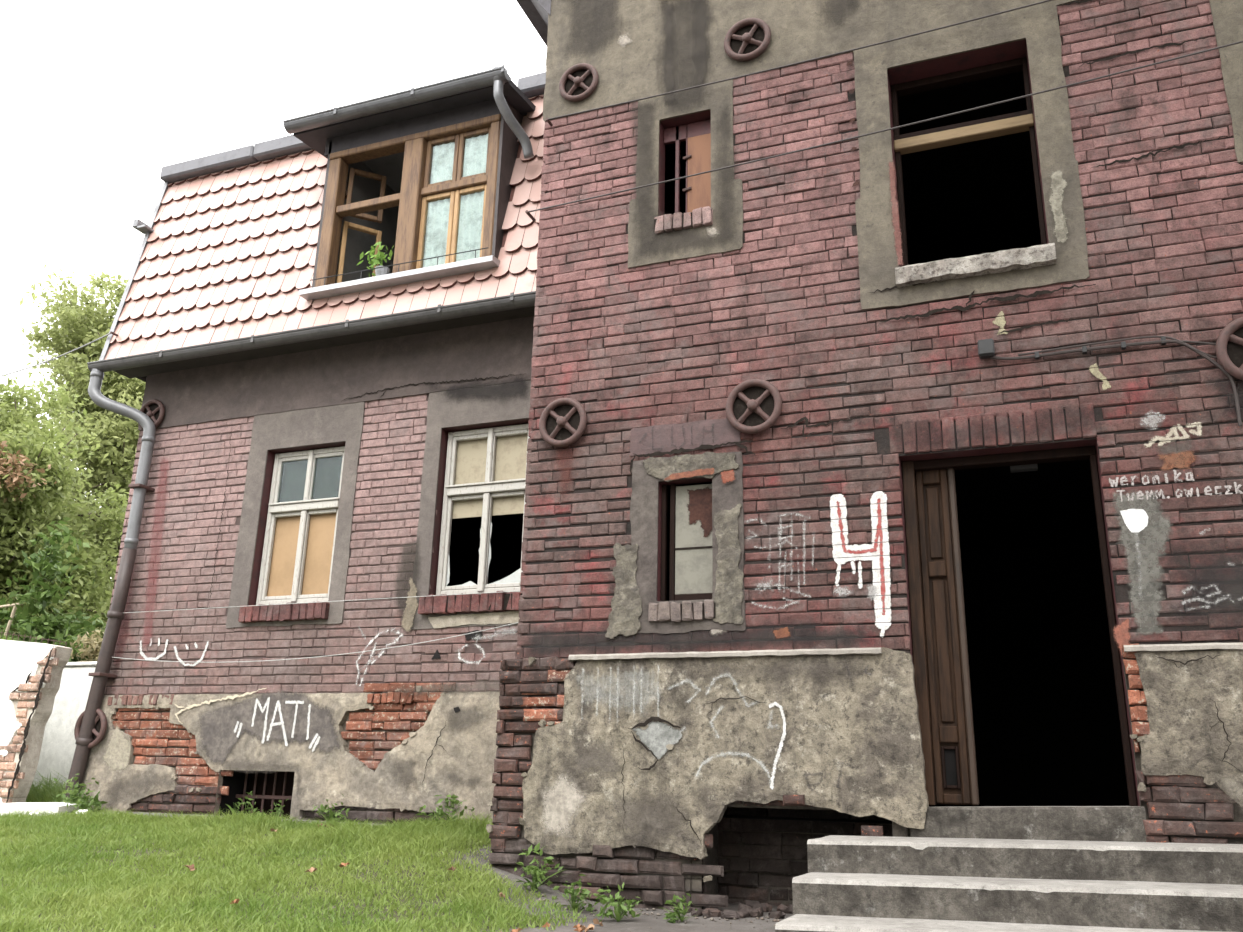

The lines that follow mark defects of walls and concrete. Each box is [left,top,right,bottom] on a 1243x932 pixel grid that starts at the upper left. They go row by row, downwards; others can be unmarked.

leakage [570,0,616,53]
crack [1092,136,1243,168]
crack [869,281,1096,334]
crack [344,374,521,400]
flaking render [643,452,739,483]
peeling [1113,491,1171,752]
spalling [0,648,59,803]
spalling [109,706,234,815]
spalling [341,682,456,770]
spalling [486,656,908,920]
spalling [1135,770,1243,844]
crack [1209,696,1243,784]